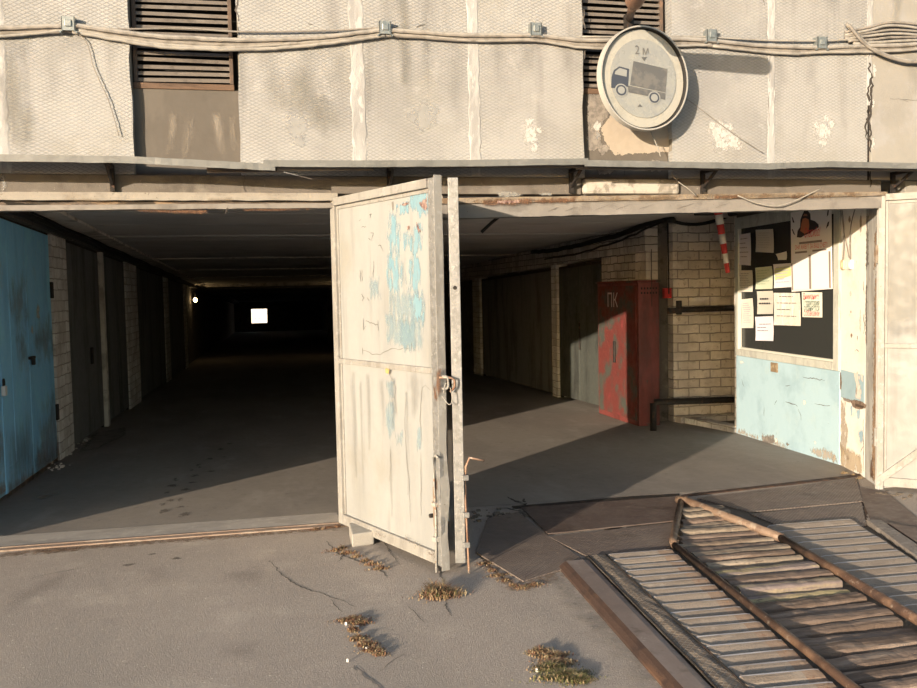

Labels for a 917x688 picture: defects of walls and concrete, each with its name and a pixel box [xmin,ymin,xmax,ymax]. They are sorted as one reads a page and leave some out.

spalling [583,0,656,36]
peeling [583,51,669,173]
crack [864,63,874,187]
peeling [386,193,428,322]
flaking render [812,372,866,474]
crack [269,560,353,612]